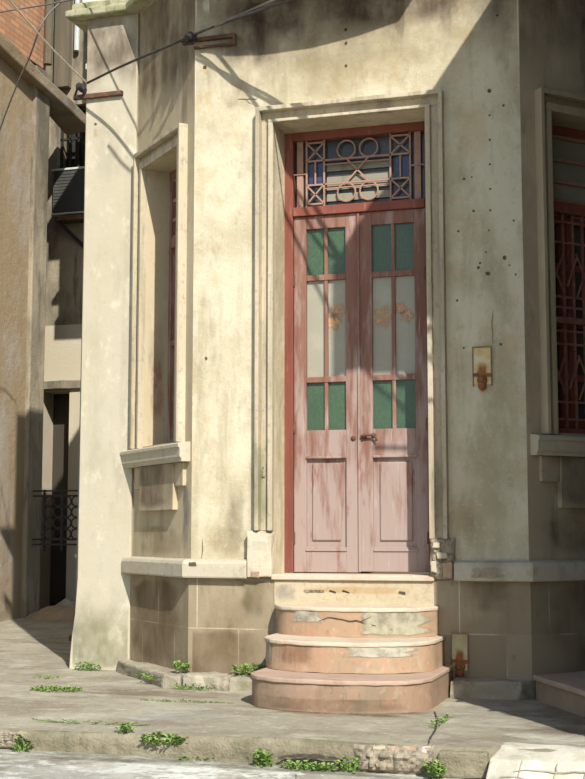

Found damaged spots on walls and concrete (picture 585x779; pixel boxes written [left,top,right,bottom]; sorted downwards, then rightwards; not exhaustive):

flaking render [430,539,454,580]
crack [319,617,392,630]
crack [428,711,527,744]
crack [278,754,344,779]
spalling [352,744,435,775]
crack [502,760,585,779]